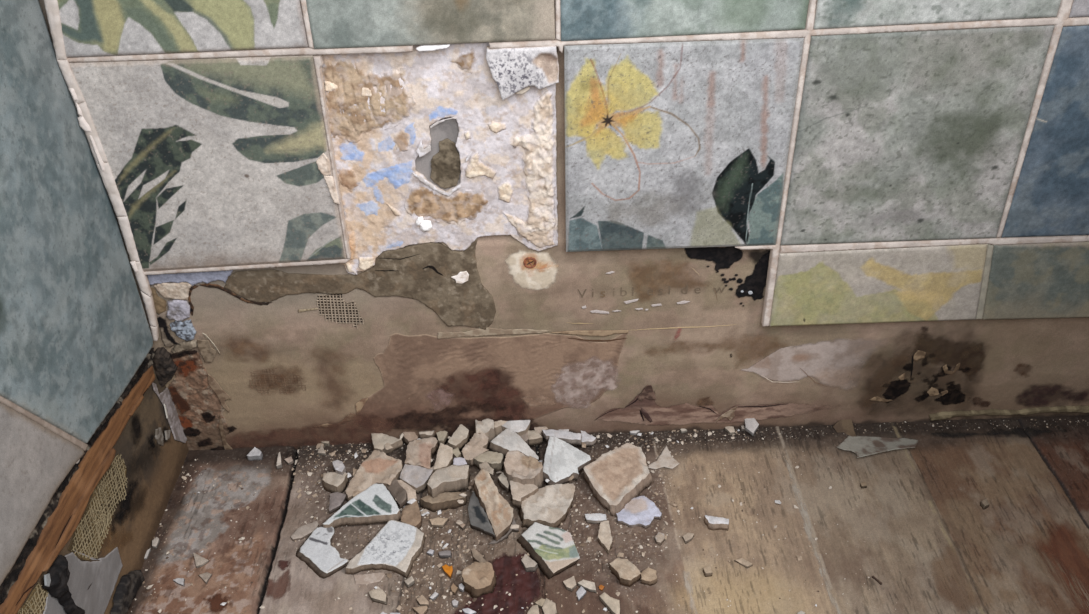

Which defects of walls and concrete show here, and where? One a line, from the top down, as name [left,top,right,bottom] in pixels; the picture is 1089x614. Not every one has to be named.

spalling [130,42,627,430]
damp [632,246,770,306]
damp [229,357,618,449]
peeling [742,339,864,389]
damp [865,327,989,412]
damp [1018,385,1088,406]
flaking render [43,547,123,614]
peeling [144,537,174,560]